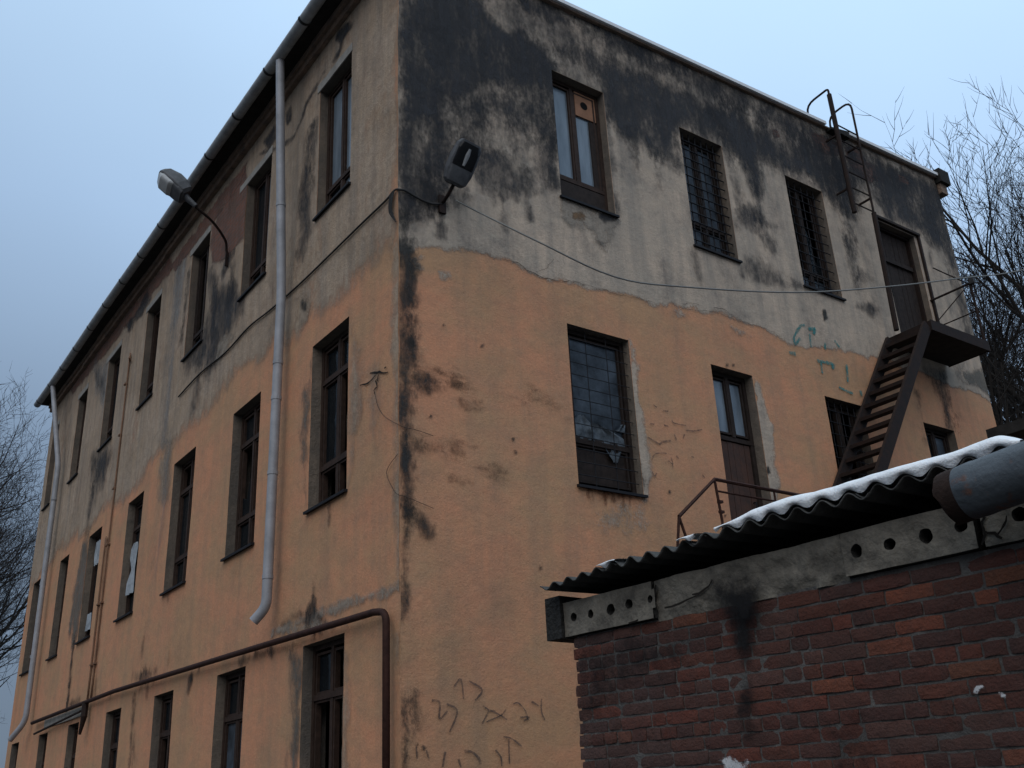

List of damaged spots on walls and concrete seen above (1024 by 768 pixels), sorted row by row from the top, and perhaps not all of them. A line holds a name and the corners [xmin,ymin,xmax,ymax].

water stain [299,123,316,252]
water stain [398,0,956,269]
water stain [187,267,241,373]
peeling [31,0,990,646]
water stain [88,449,109,517]
water stain [404,507,434,538]